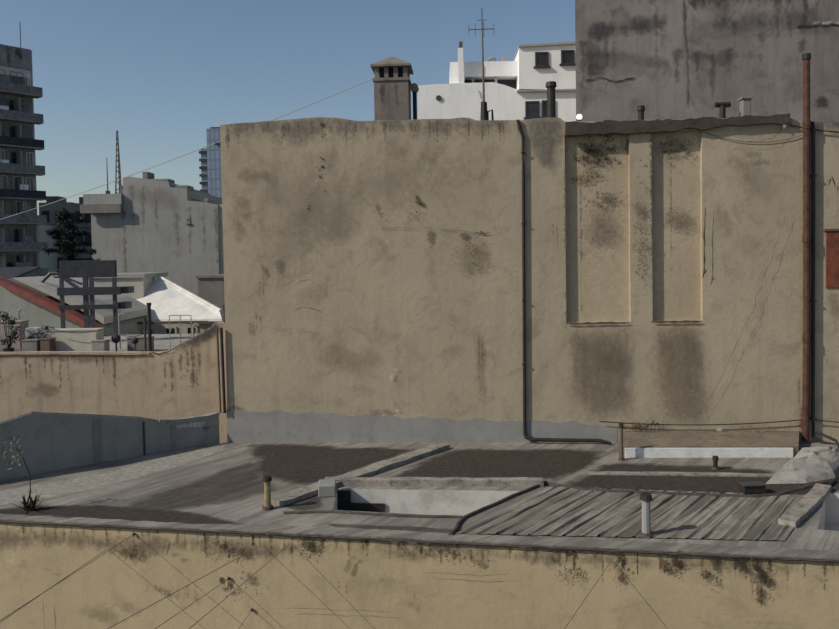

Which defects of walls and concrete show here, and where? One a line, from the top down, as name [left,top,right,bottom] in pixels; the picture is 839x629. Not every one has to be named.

leakage [589,18,662,39]
leakage [563,135,698,281]
crack [699,208,786,413]
leakage [169,323,217,390]
leakage [199,533,273,562]
leakage [552,549,585,586]
leakage [601,553,638,582]
leakage [659,551,687,579]
leakage [699,554,776,604]